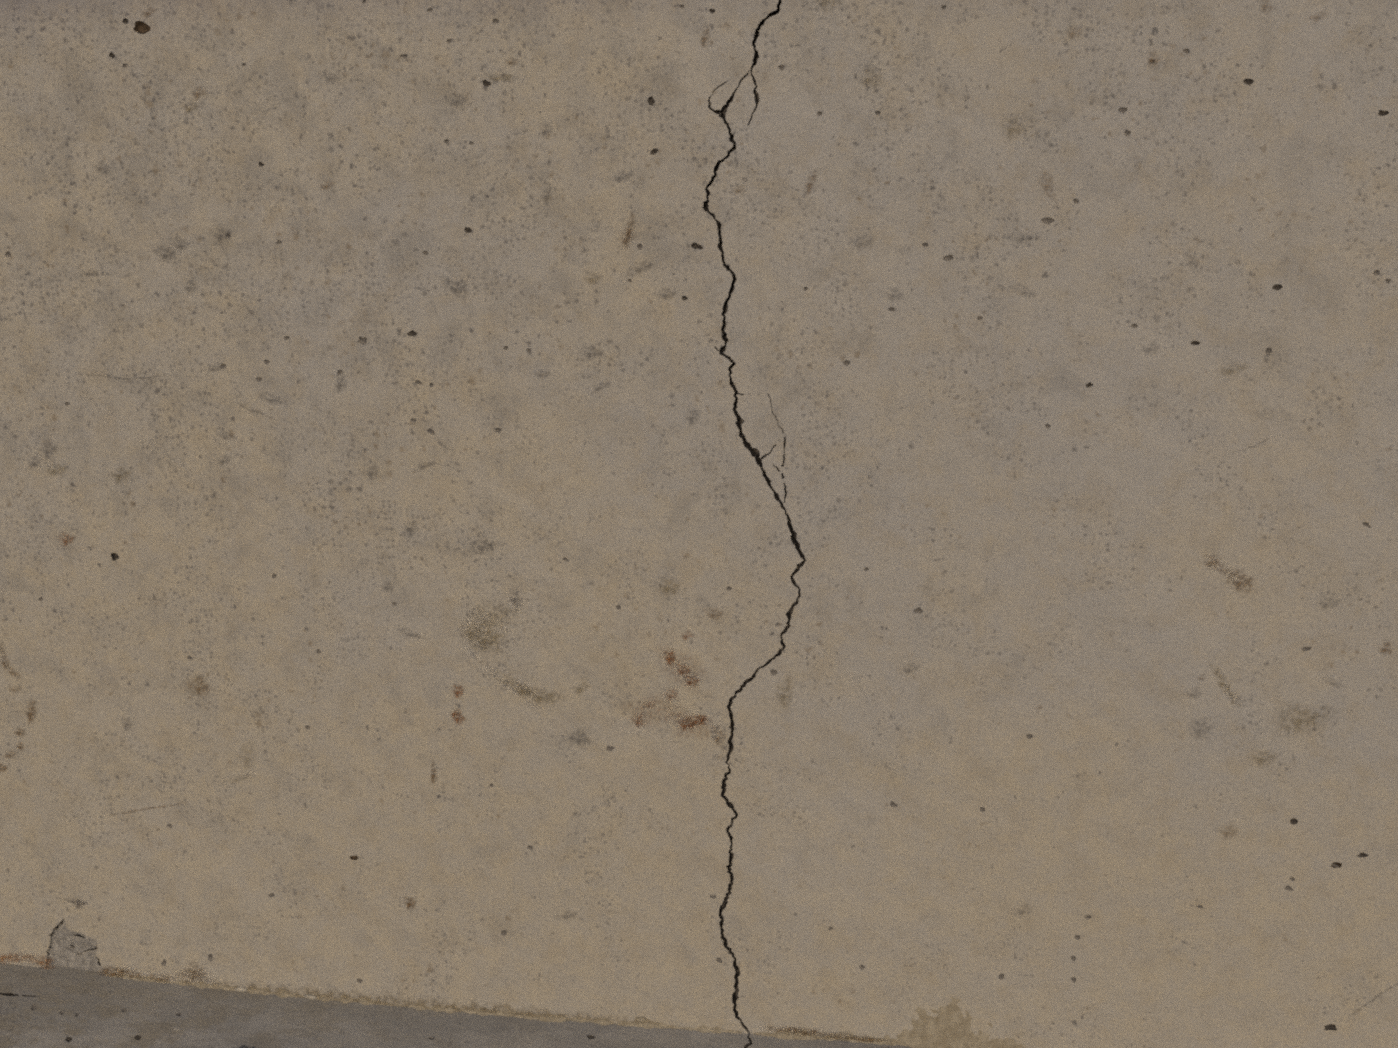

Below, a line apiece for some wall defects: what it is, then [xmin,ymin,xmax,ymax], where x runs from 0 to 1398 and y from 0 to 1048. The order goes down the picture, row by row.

crack [702,0,806,1048]